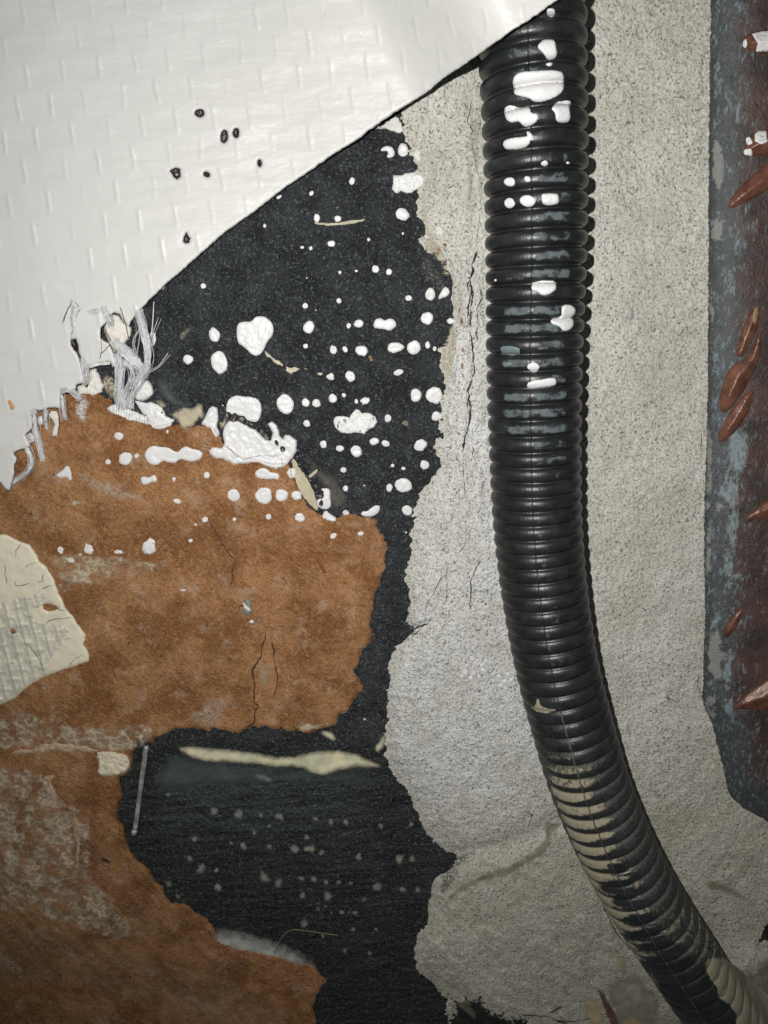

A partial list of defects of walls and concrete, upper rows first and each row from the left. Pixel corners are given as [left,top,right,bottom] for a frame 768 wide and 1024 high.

crack [462,100,484,491]
peeling [107,401,174,429]
peeling [202,406,324,507]
crack [209,519,278,728]
peeling [12,742,98,755]